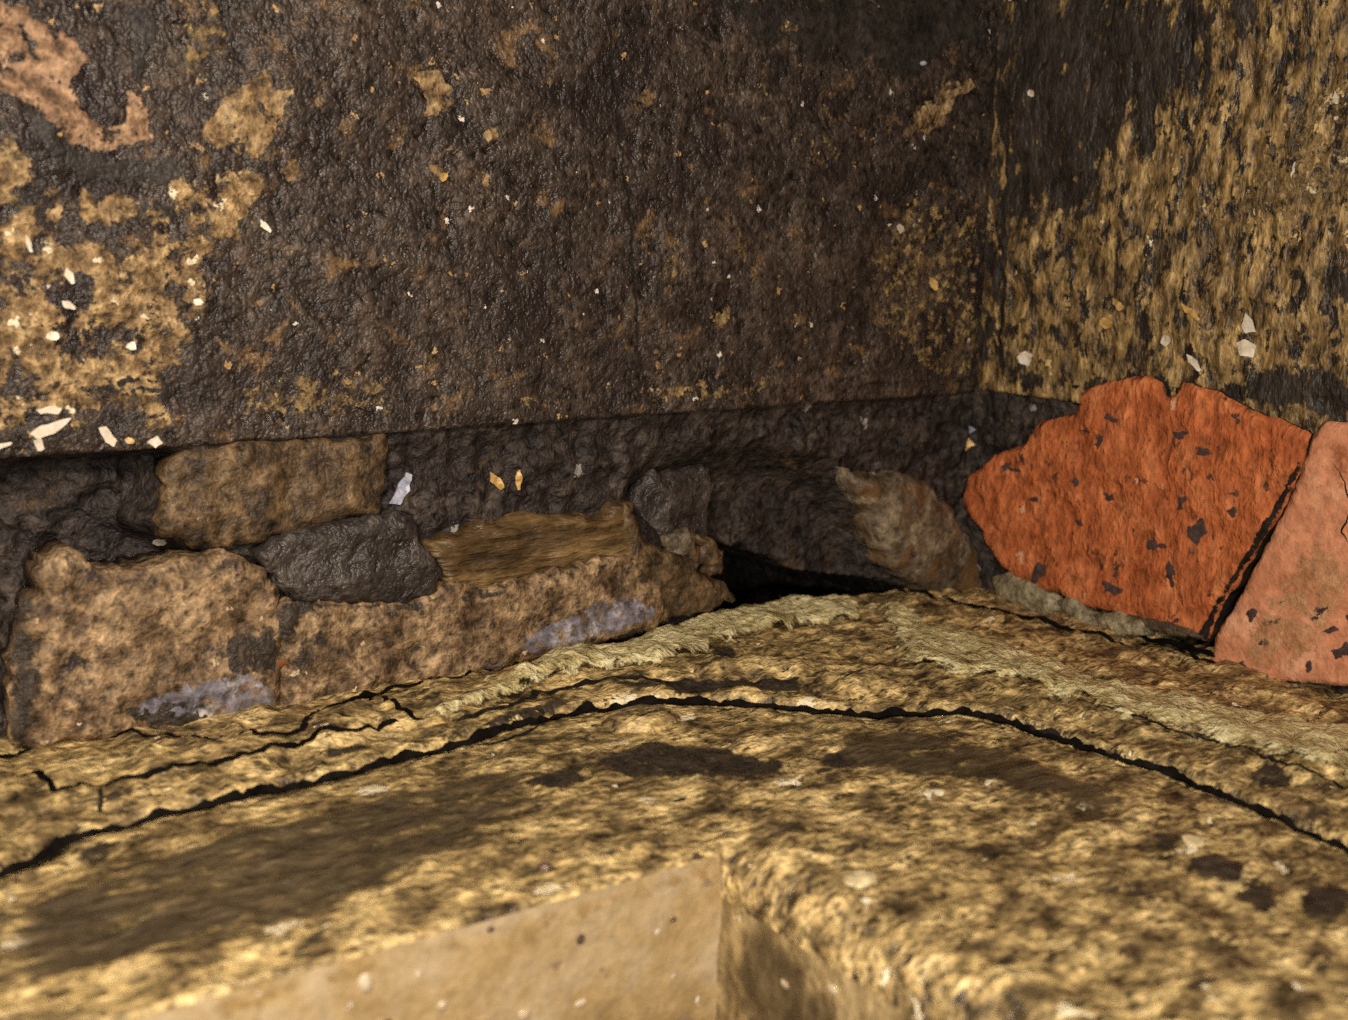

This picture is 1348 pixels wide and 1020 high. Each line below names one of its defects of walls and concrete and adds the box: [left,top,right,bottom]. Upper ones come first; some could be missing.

crack [0,661,1348,878]